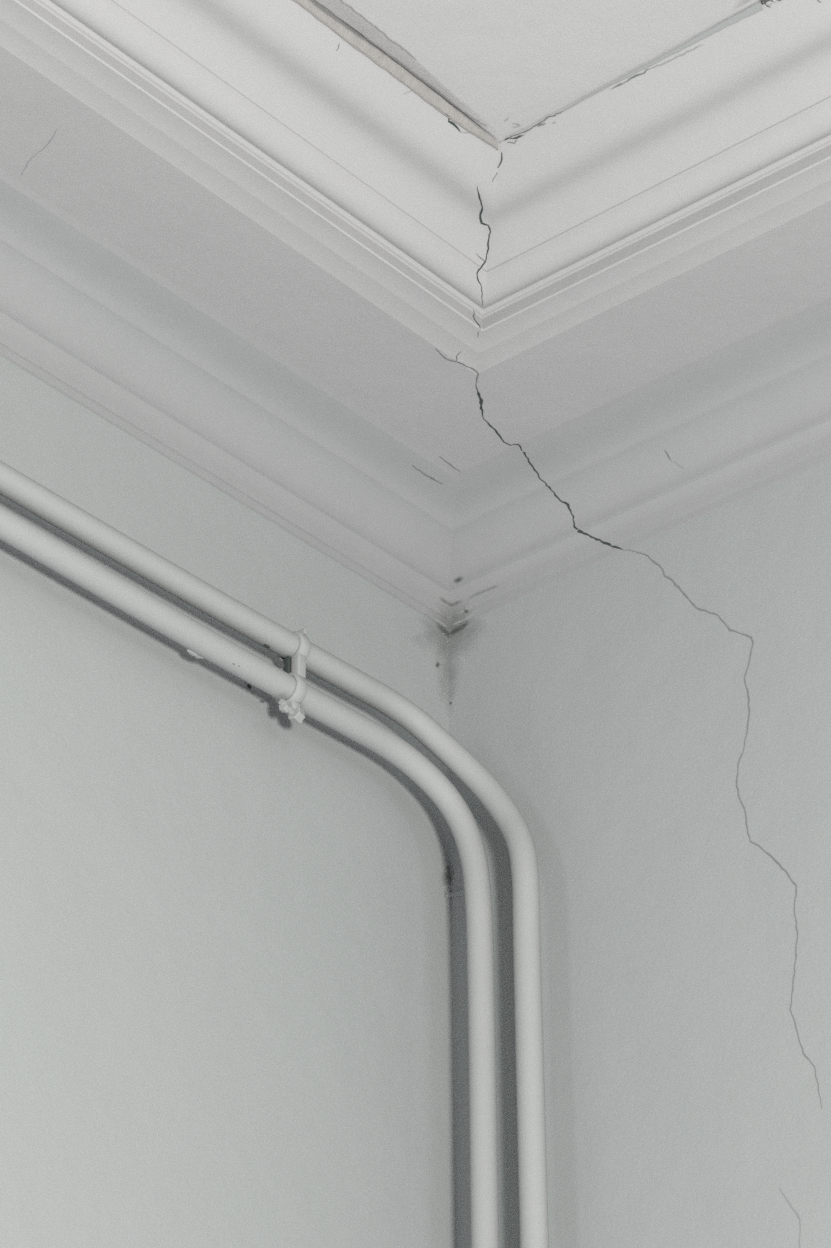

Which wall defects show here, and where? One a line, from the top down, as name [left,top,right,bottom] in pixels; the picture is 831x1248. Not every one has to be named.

spalling [293,0,499,150]
crack [436,2,822,1107]